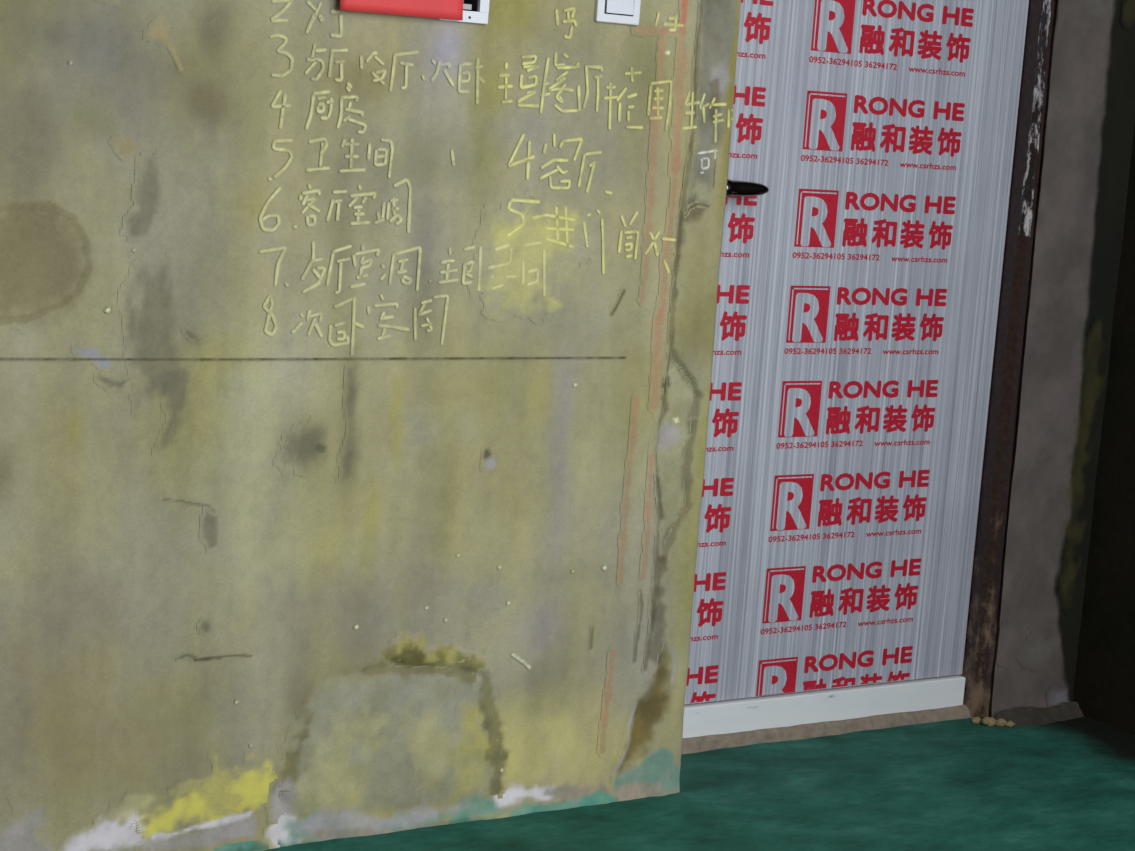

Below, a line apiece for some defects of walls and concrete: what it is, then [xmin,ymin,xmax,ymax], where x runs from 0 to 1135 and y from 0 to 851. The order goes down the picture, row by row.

crack [680,0,717,218]
leakage [0,187,105,335]
crack [642,264,706,674]
leakage [0,748,620,851]